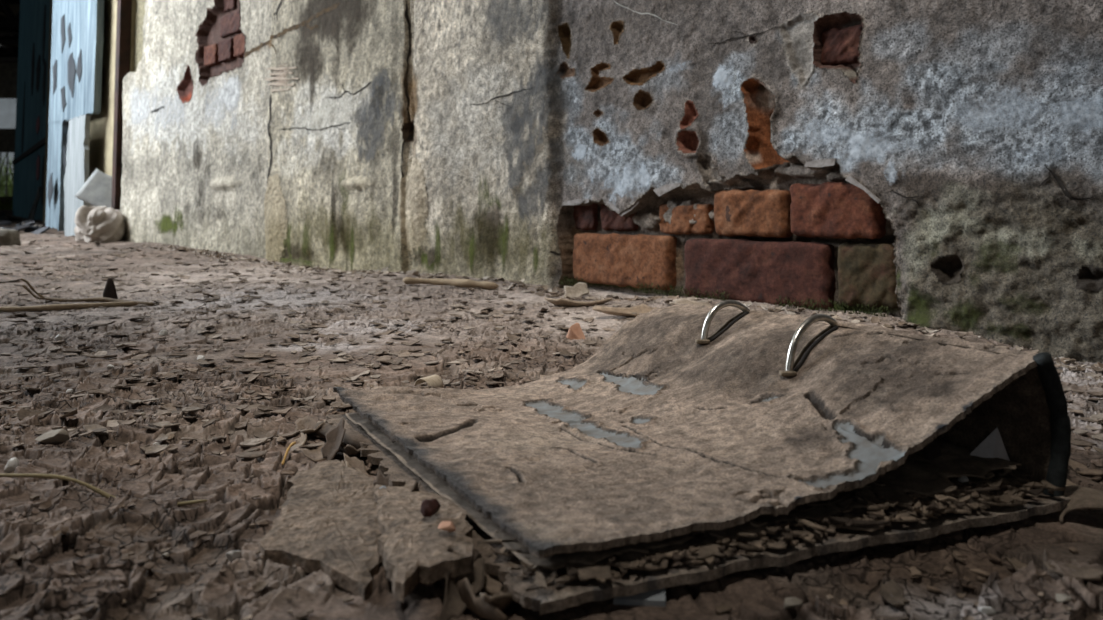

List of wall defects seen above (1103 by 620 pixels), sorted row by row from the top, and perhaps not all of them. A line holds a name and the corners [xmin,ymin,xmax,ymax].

spalling [177,0,246,103]
crack [245,0,340,57]
leakage [297,0,400,160]
crack [401,1,415,178]
spalling [557,23,575,79]
spalling [609,20,624,44]
spalling [585,61,664,110]
spalling [780,12,863,88]
crack [267,80,374,185]
leakage [304,180,342,261]
spalling [544,78,902,319]